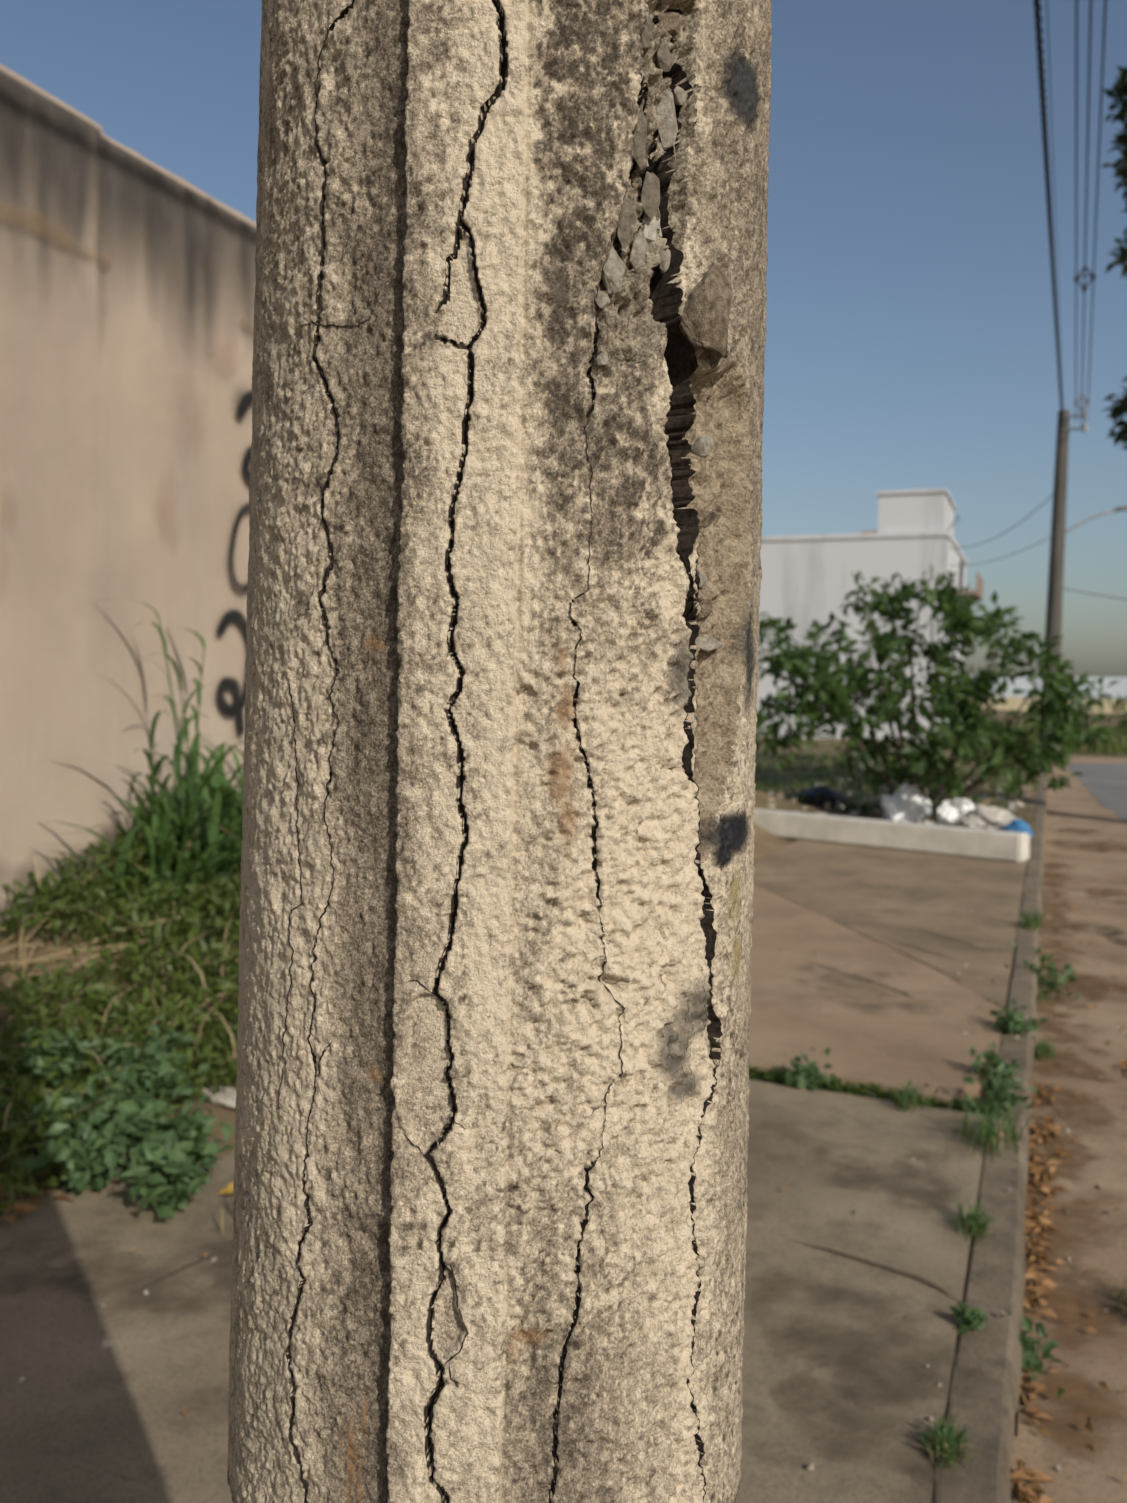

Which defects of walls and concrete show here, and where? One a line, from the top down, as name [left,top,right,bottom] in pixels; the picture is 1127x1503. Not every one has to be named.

crack [278,0,371,1503]
crack [403,0,507,1503]
crack [548,288,625,1503]
spalling [595,0,702,367]
crack [613,9,723,1501]
crack [786,1238,955,1299]